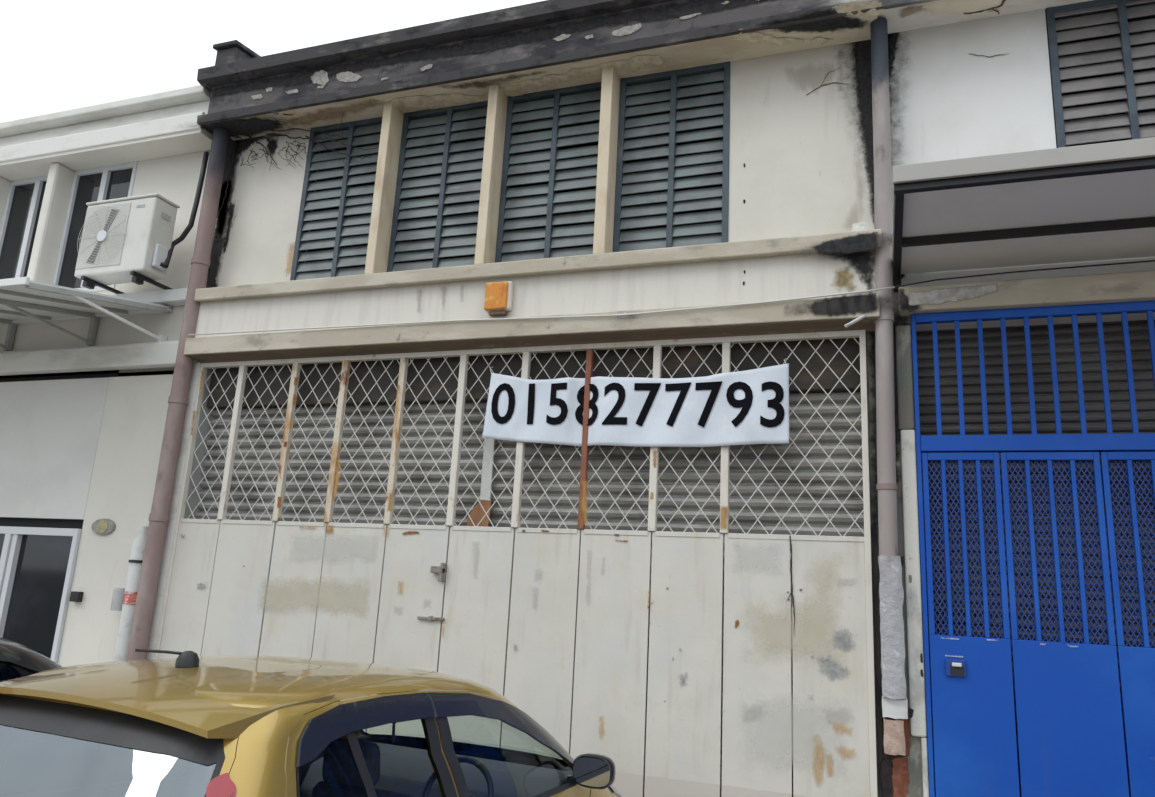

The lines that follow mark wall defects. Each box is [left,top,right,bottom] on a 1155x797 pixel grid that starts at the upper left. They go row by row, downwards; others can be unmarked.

peeling [833,0,885,18]
crack [963,0,1006,14]
peeling [612,23,642,36]
peeling [724,29,833,46]
water stain [201,100,378,288]
water stain [761,9,920,483]
spalling [880,711,910,797]